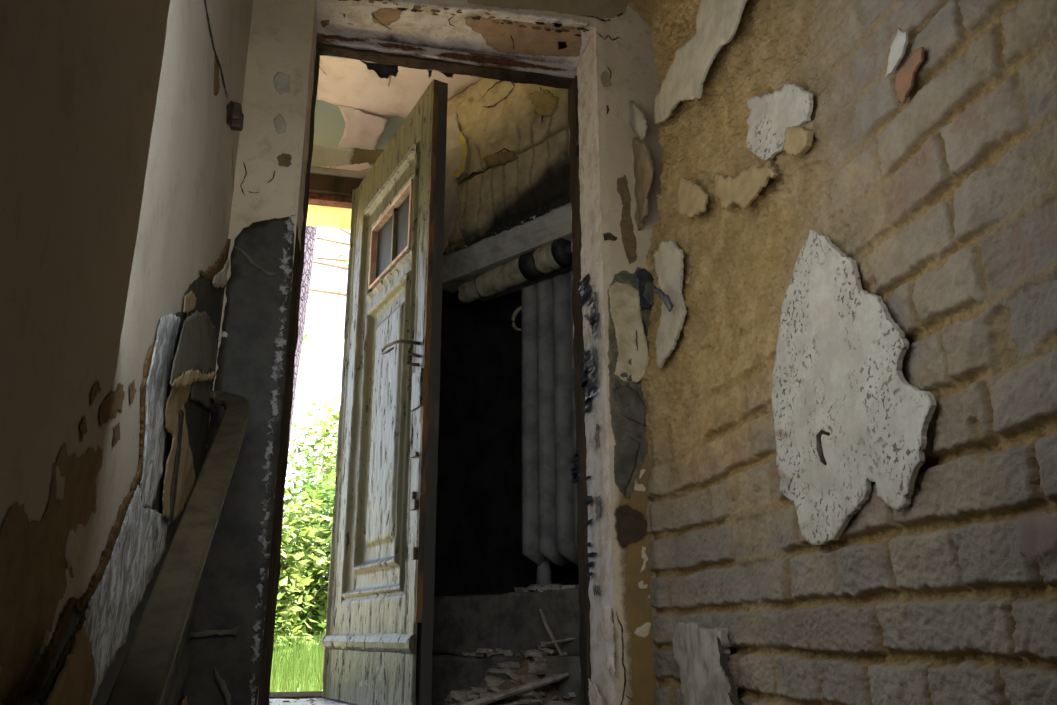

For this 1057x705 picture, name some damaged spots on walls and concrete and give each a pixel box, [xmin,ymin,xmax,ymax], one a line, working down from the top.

crack [205,0,228,98]
peeling [316,55,482,150]
peeling [327,0,627,57]
crack [461,148,510,181]
crack [480,80,515,108]
flaking render [676,83,813,217]
spalling [884,28,924,104]
peeling [571,0,747,499]
flaking render [768,229,937,546]
peeling [0,214,296,705]
peeling [569,450,616,675]
peeling [588,679,604,705]